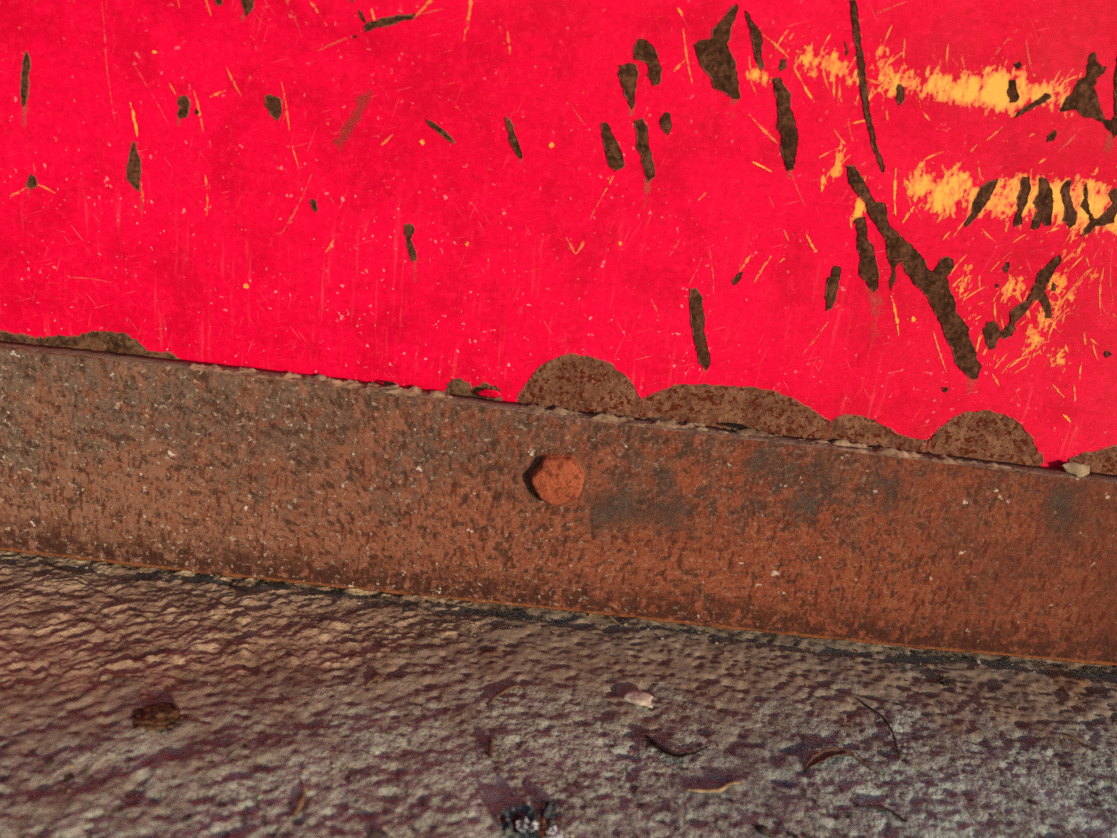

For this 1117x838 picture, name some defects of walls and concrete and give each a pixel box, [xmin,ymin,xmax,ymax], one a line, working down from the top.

peeling [20,50,32,123]
peeling [126,141,143,209]
peeling [601,121,625,171]
peeling [618,38,672,193]
peeling [695,0,1117,389]
peeling [0,329,502,402]
peeling [516,287,1044,474]
peeling [1061,444,1117,477]
rust [0,340,1117,736]